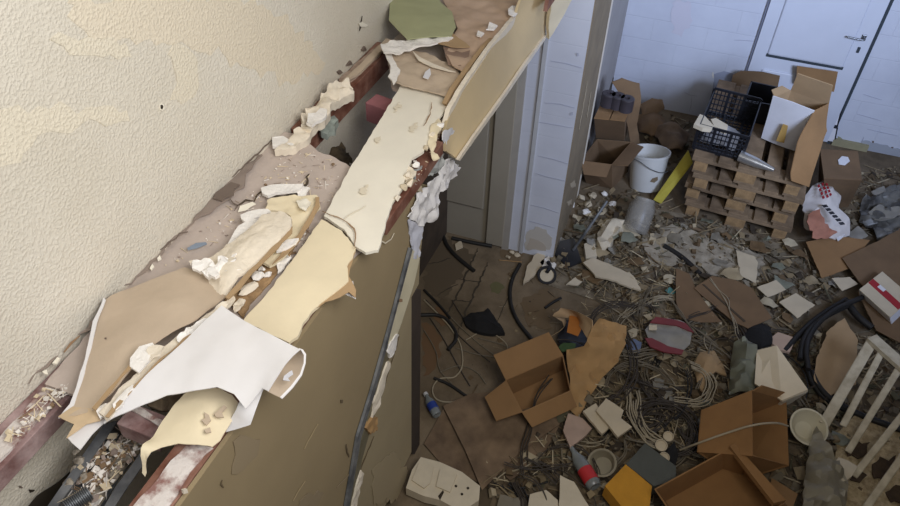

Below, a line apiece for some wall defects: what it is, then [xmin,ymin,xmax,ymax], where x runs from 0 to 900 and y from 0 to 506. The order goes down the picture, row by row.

spalling [193,154,263,220]
crack [437,248,488,333]